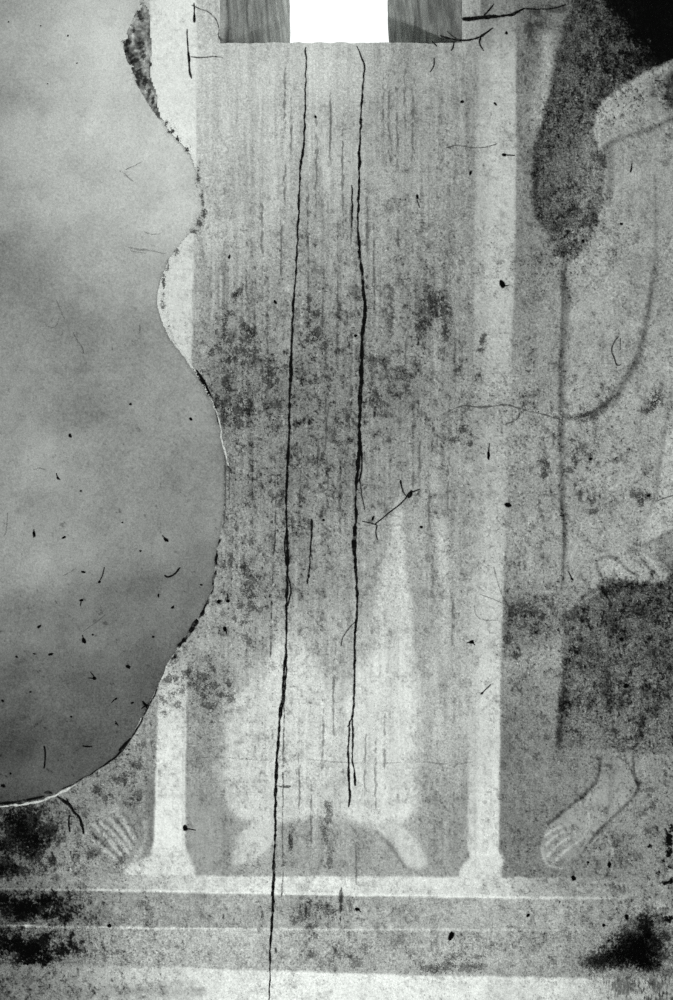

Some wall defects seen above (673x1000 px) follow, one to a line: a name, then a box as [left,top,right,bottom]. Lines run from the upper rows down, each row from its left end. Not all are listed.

spalling [121,3,189,151]
crack [430,4,566,72]
spalling [191,162,208,233]
peeling [165,287,282,466]
crack [341,46,420,807]
crack [269,47,313,1000]
spalling [0,784,76,807]
leakage [0,800,92,968]
leakage [581,907,673,972]
leakage [656,824,673,885]